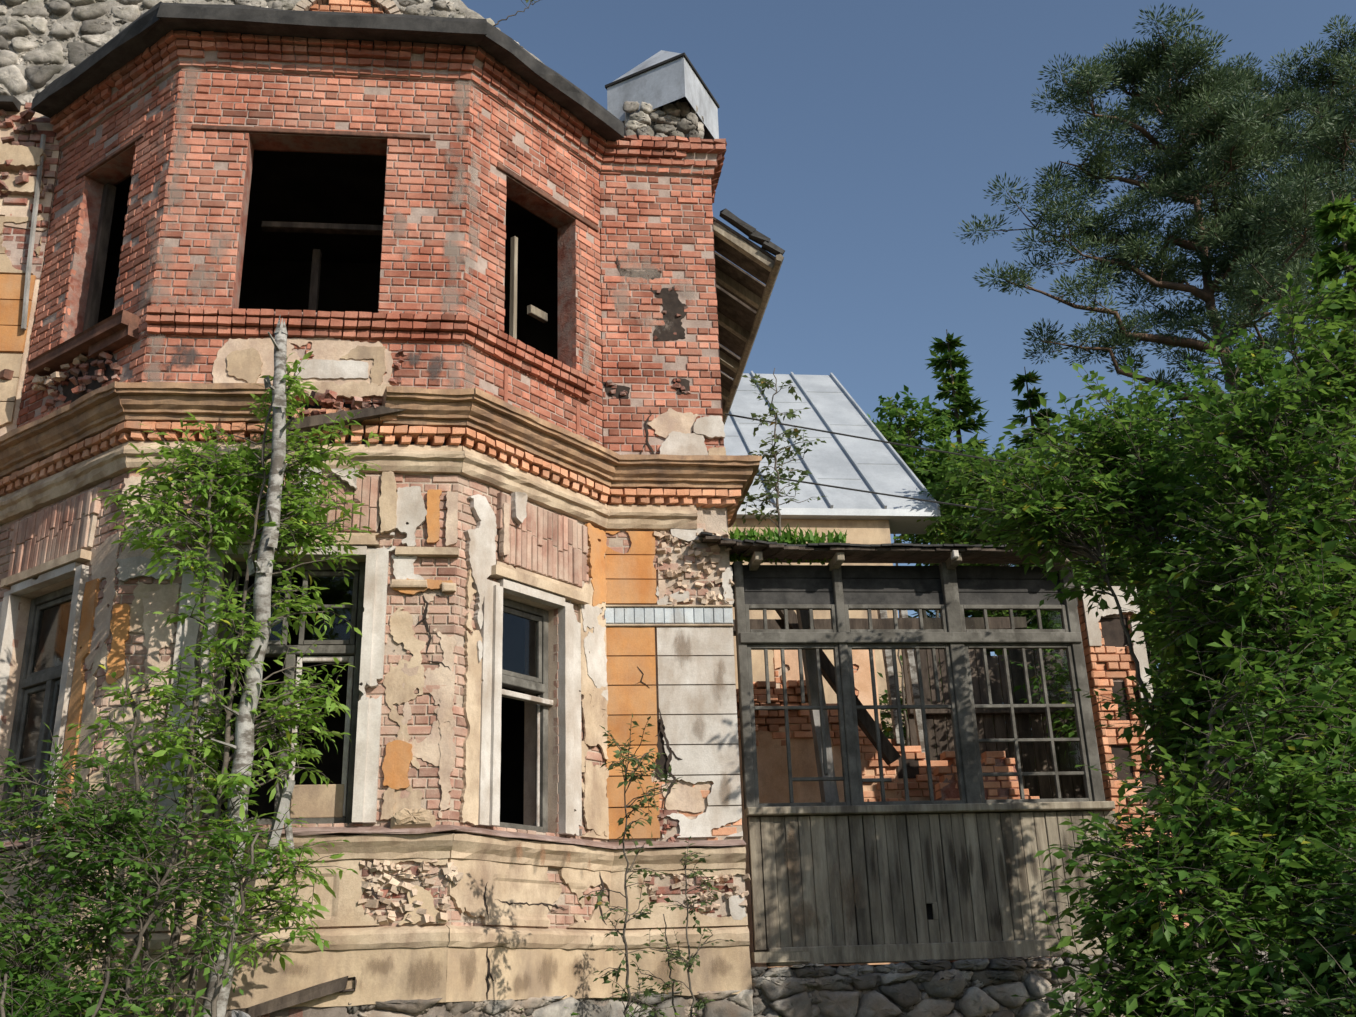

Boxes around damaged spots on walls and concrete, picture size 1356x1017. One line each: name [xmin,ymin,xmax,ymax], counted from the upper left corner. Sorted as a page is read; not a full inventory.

spalling [0,102,60,280]
spalling [615,257,688,341]
flaking render [212,337,407,399]
flaking render [648,378,726,455]
flaking render [298,467,359,516]
spalling [650,523,734,606]
flaking render [379,471,528,826]
crack [636,666,682,809]
spalling [653,775,713,850]
spalling [358,859,464,926]
crack [596,872,607,925]
crack [483,883,564,1000]